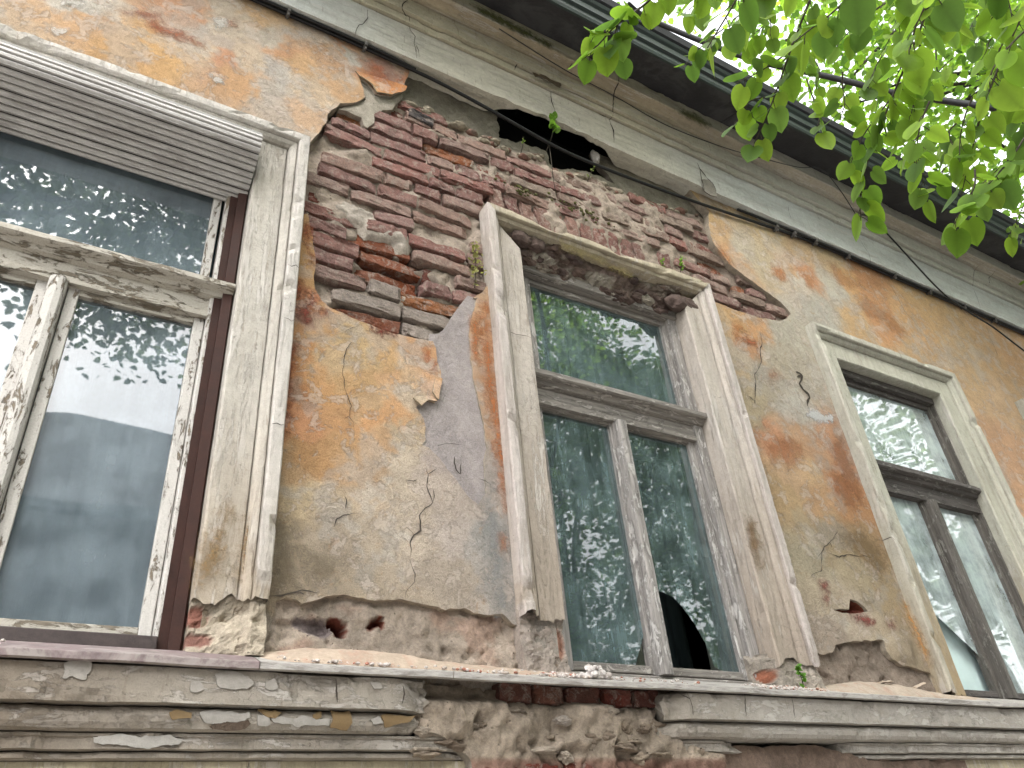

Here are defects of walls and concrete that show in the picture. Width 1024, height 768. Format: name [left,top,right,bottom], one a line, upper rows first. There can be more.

flaking render [304,70,789,505]
crack [749,338,762,404]
crack [405,443,491,597]
crack [811,531,895,576]
flaking render [181,593,572,676]
peeling [62,661,92,680]
peeling [190,671,278,693]
flaking render [743,641,947,696]
peeling [93,734,183,749]
peeling [169,709,352,731]
peeling [369,714,416,728]